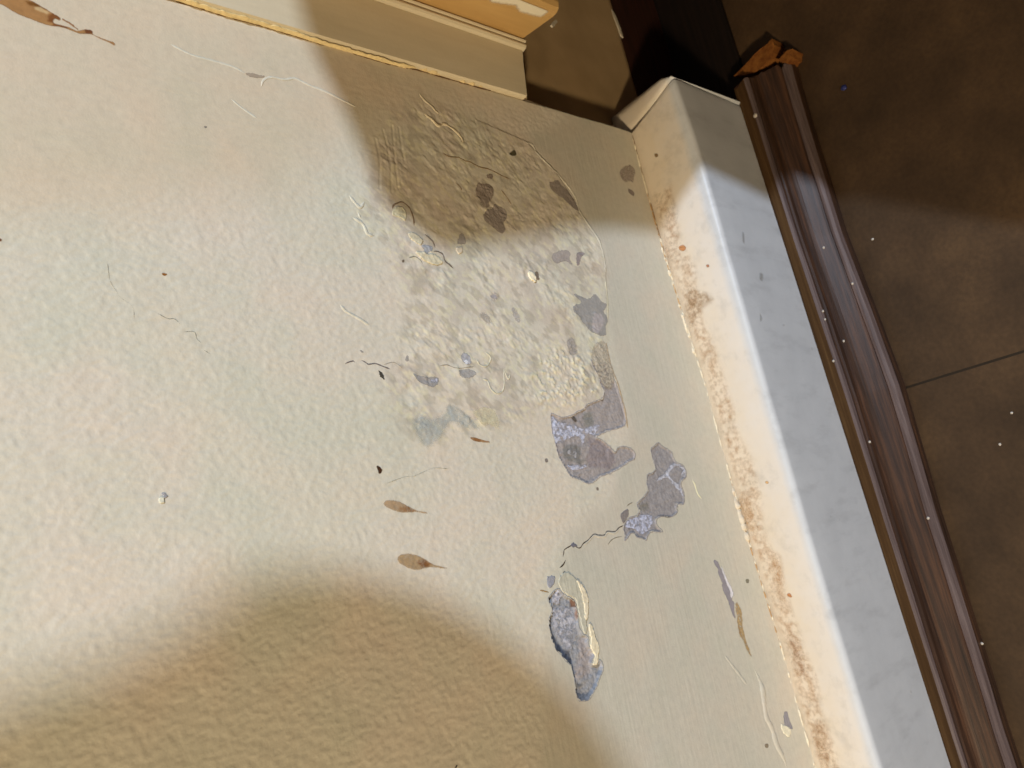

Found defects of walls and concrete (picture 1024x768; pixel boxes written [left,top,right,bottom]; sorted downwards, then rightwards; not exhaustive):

peeling [476,174,507,233]
peeling [550,181,579,210]
damp [417,406,498,444]
flaking render [550,294,636,484]
crack [560,502,633,572]
flaking render [620,442,687,541]
spalling [547,572,604,702]
peeling [714,560,751,655]